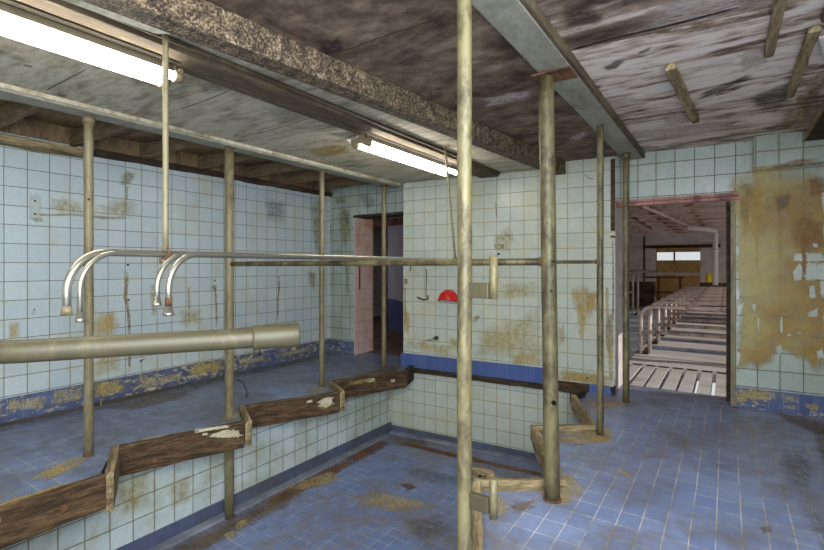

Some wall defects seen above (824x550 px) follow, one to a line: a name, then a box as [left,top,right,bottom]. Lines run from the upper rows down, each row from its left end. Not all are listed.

damp [565,0,612,24]
damp [702,77,748,98]
damp [752,87,786,108]
peeling [793,243,824,320]
peeling [736,290,759,334]
peeling [735,388,819,411]
spalling [472,441,536,459]
spalling [0,379,457,550]